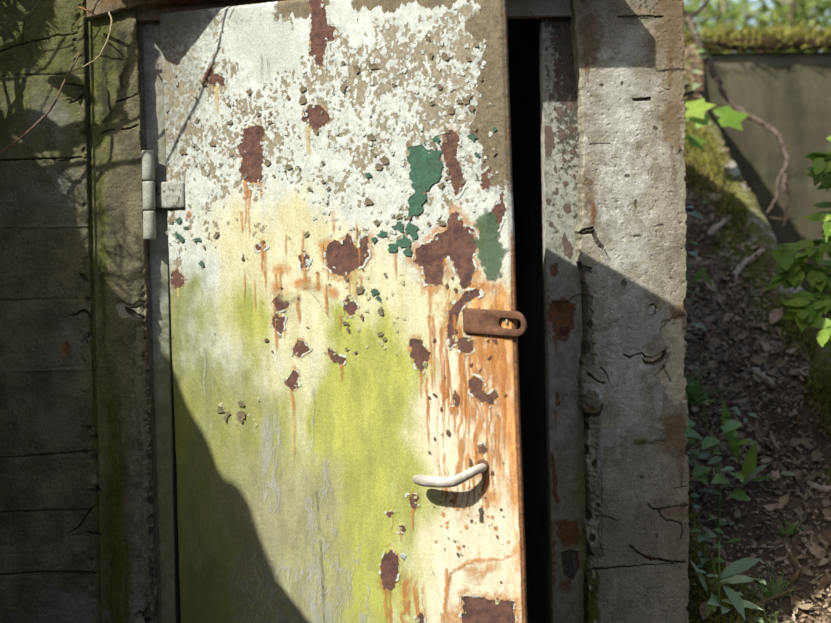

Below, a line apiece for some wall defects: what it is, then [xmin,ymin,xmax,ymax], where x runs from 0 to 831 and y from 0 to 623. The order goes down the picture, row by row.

crack [0,2,77,52]
crack [0,74,85,104]
leakage [100,34,124,116]
leakage [82,32,101,240]
peeling [287,34,497,256]
peeling [166,204,207,250]
peeling [470,188,508,286]
peeling [342,275,395,332]
rust [409,130,518,623]
rust [384,492,420,534]
crack [648,486,689,539]
rust [378,550,426,623]